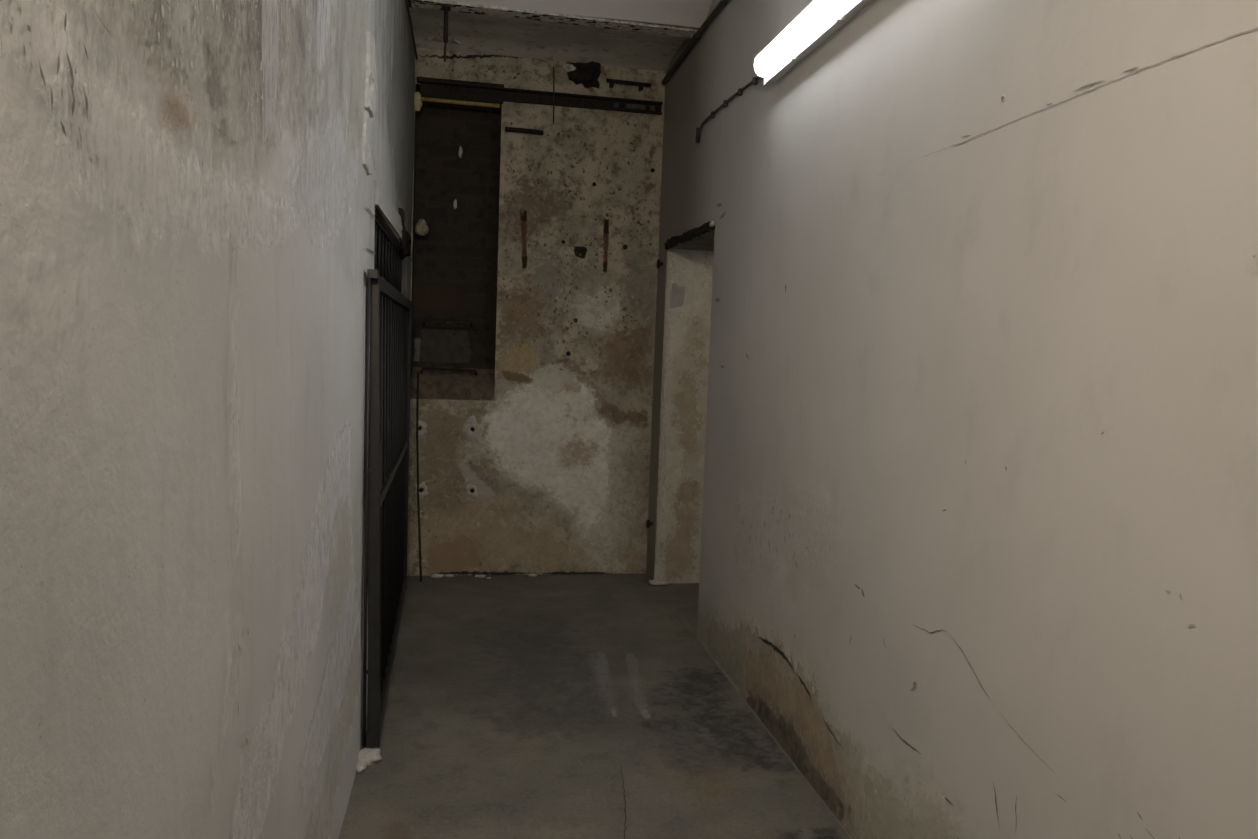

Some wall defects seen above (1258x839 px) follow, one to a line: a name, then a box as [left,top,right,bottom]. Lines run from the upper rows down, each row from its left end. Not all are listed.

peeling [9,0,99,166]
peeling [132,0,362,144]
crack [914,27,1258,161]
damp [559,245,656,425]
damp [408,400,640,575]
damp [642,623,877,839]
crack [914,625,1046,764]